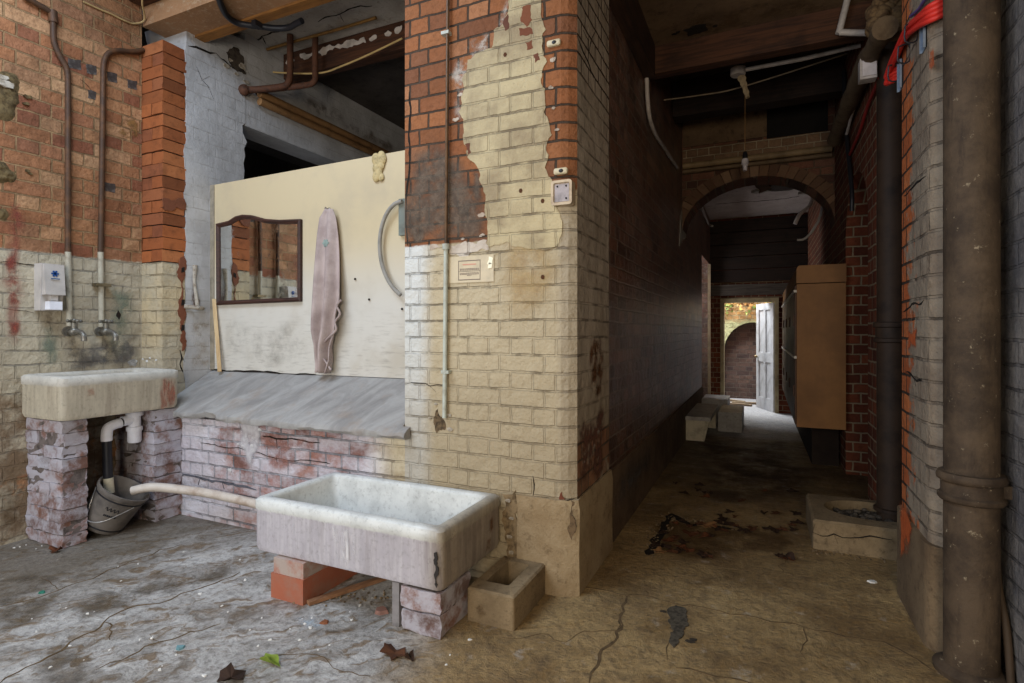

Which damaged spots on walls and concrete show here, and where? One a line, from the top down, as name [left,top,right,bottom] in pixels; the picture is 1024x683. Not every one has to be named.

peeling [300,25,402,60]
peeling [430,0,563,257]
spalling [177,256,187,351]
spalling [502,490,517,558]
peeling [559,492,577,540]
crack [812,525,891,541]
crack [1,545,179,607]
crack [0,572,240,683]
crack [255,653,368,676]
crack [502,587,935,683]